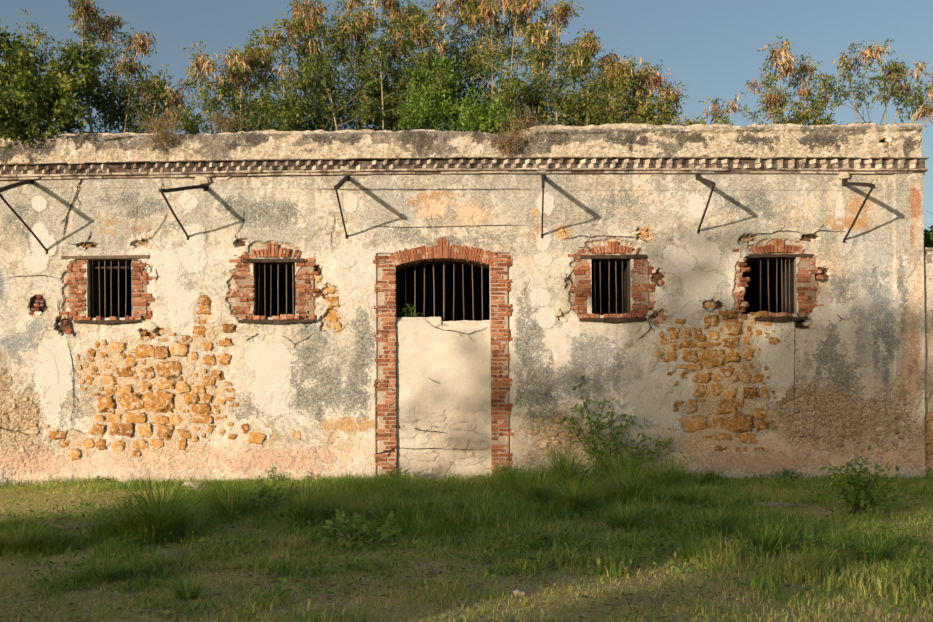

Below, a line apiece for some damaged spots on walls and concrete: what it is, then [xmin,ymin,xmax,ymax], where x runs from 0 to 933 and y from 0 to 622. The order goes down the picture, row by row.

crack [61,179,91,246]
flaking render [738,235,754,245]
flaking render [801,233,821,243]
leakage [0,316,47,370]
crack [57,302,82,433]
flaking render [0,293,270,463]
leakage [228,392,263,421]
leakage [289,306,375,425]
leakage [512,288,631,422]
flaking render [646,257,911,459]
leakage [812,255,923,409]
flaking render [924,413,933,462]